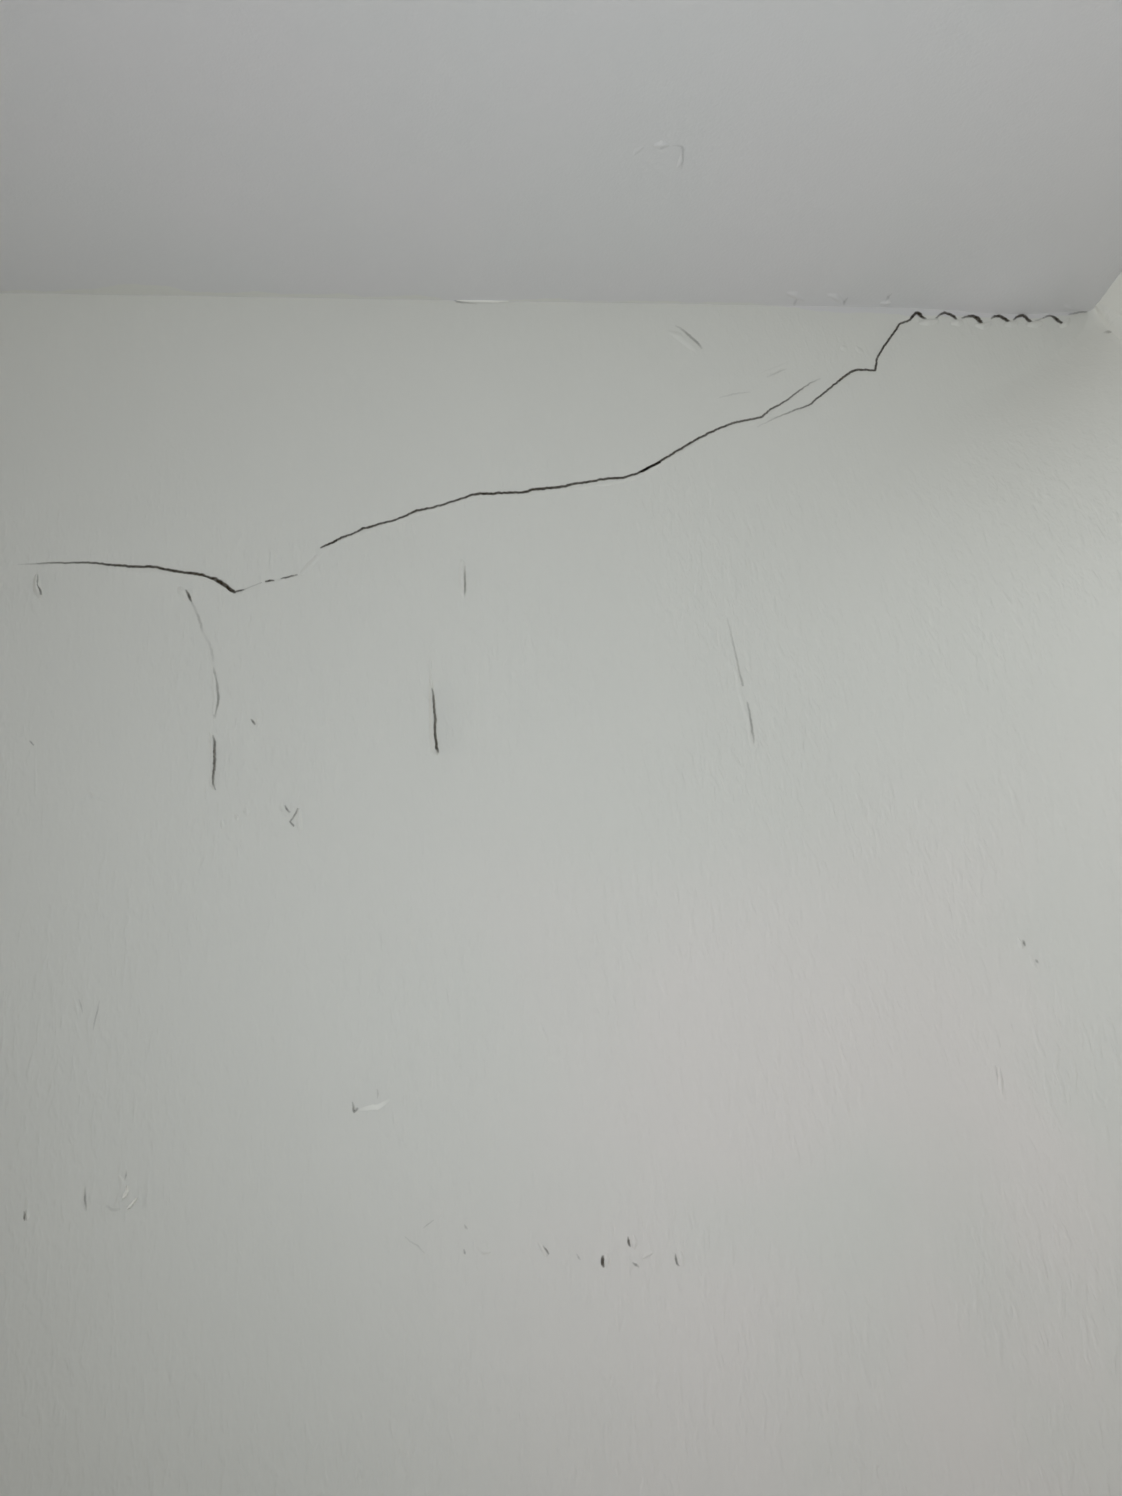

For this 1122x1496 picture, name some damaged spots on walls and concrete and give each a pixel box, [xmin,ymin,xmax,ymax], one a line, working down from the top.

crack [70,311,1071,602]
crack [209,665,219,790]